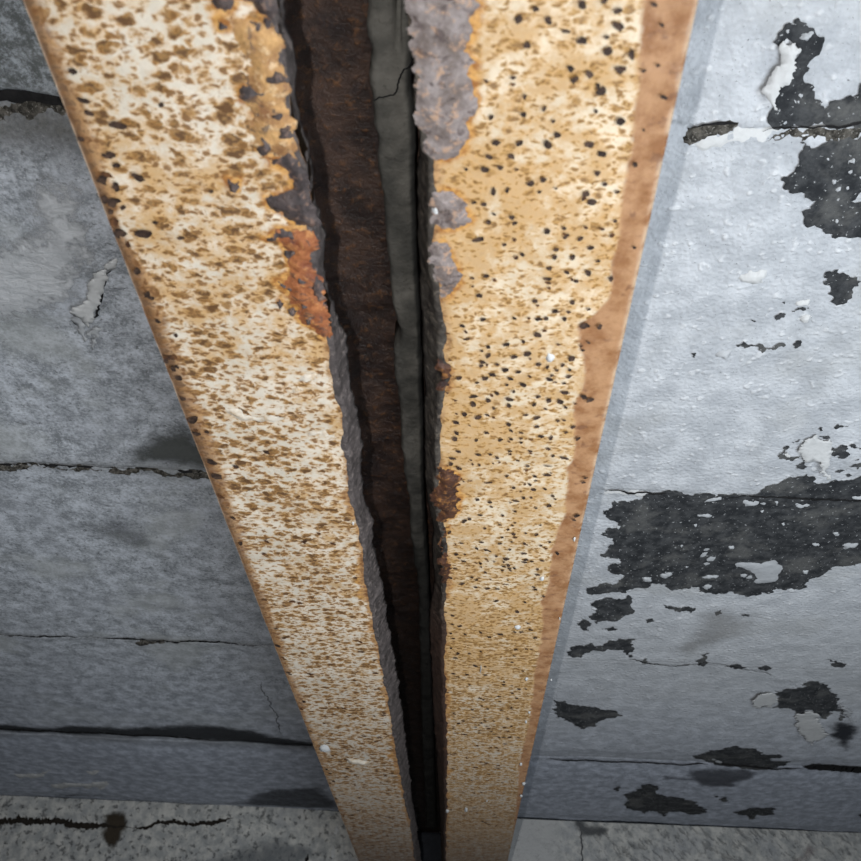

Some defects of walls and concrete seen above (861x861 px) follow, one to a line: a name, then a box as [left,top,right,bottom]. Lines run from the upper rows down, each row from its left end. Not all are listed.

crack [374,60,413,101]
crack [0,89,66,121]
peeling [694,18,861,239]
peeling [823,269,861,306]
crack [0,462,209,479]
peeling [567,424,861,665]
crack [0,682,313,746]
peeling [552,700,622,729]
peeling [752,681,853,746]
corrosion [103,813,126,847]
crack [0,800,231,831]
peeling [613,784,707,817]